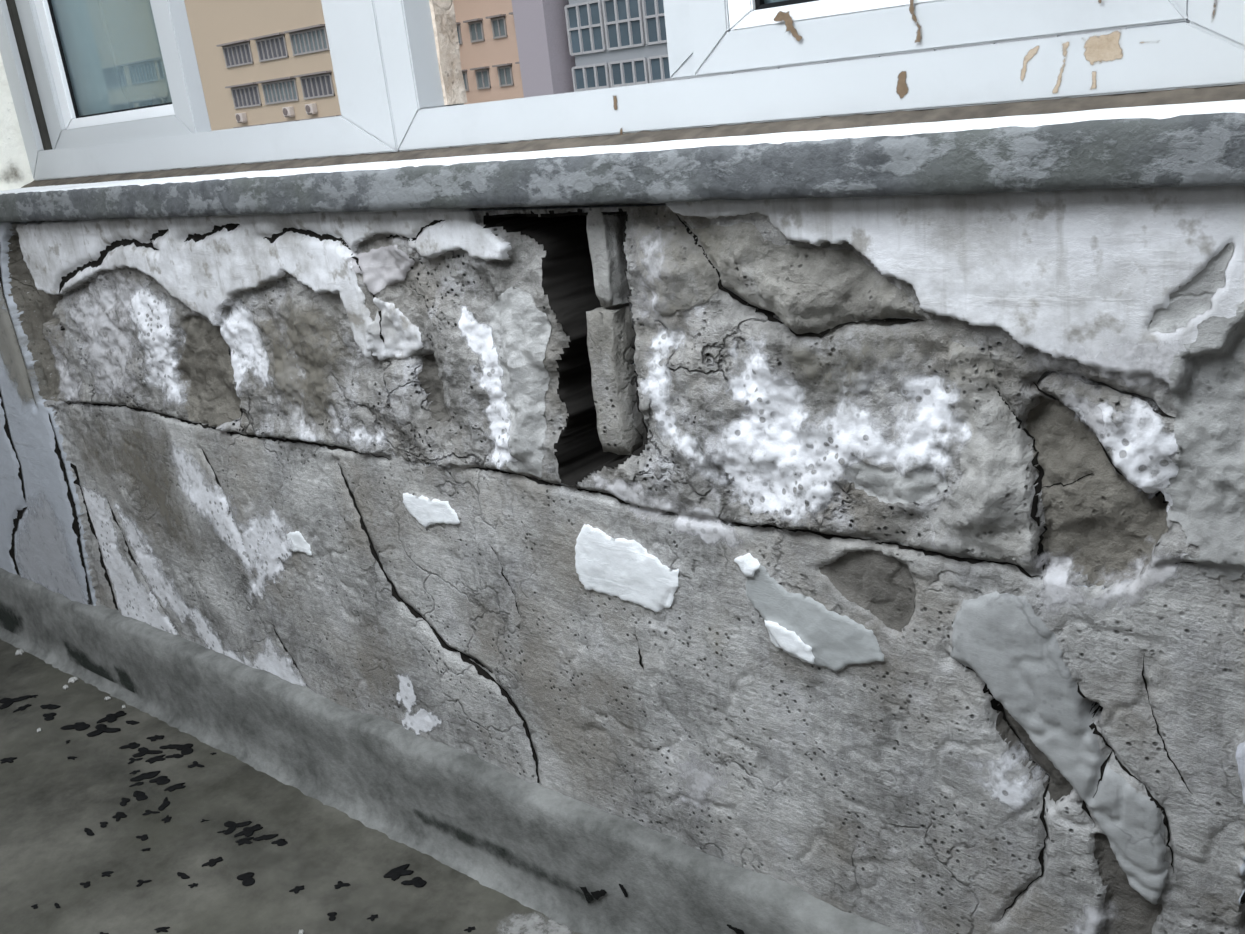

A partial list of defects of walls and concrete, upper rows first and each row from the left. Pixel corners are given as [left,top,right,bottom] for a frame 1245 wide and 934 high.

rust [774,11,802,41]
rust [909,0,921,43]
rust [896,71,908,99]
rust [1020,46,1039,81]
rust [1084,31,1123,89]
crack [386,220,445,242]
crack [59,223,384,342]
crack [676,214,925,338]
crack [470,467,678,515]
crack [709,370,1175,578]
crack [0,270,539,783]
spalling [7,186,1245,934]